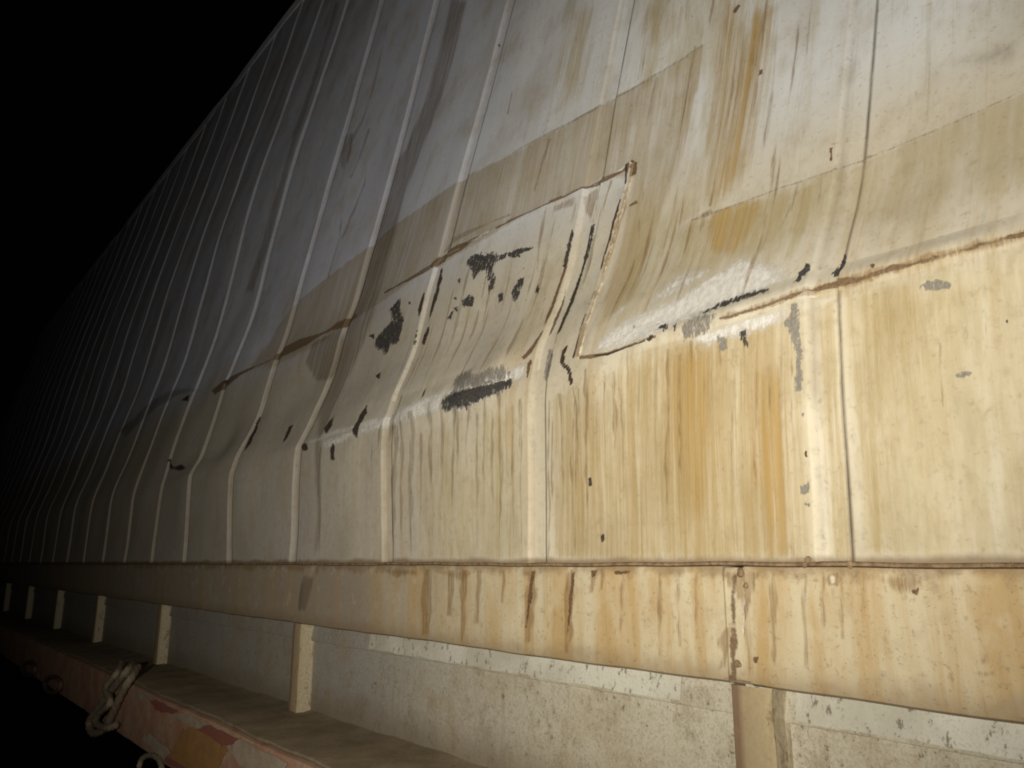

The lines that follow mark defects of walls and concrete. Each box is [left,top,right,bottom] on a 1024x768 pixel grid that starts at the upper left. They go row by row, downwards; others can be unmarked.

corrosion [725,15,762,183]
corrosion [384,163,633,293]
corrosion [212,315,356,394]
peeling [301,224,595,460]
peeling [598,259,811,391]
corrosion [719,256,938,319]
peeling [920,279,951,291]
corrosion [764,386,783,552]
corrosion [526,571,535,622]
corrosion [567,572,575,632]
corrosion [729,575,746,679]